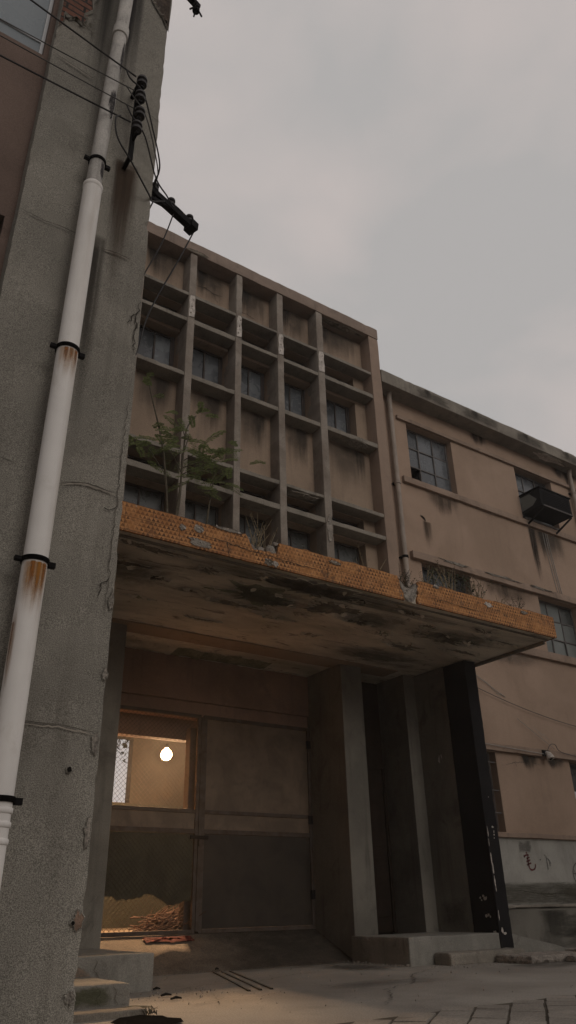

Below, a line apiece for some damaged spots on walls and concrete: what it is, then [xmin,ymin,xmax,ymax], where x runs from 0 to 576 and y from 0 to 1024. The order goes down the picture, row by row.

crack [127,302,141,352]
crack [61,402,129,615]
water stain [528,528,559,561]
rust [25,560,46,590]
peeling [392,578,467,647]